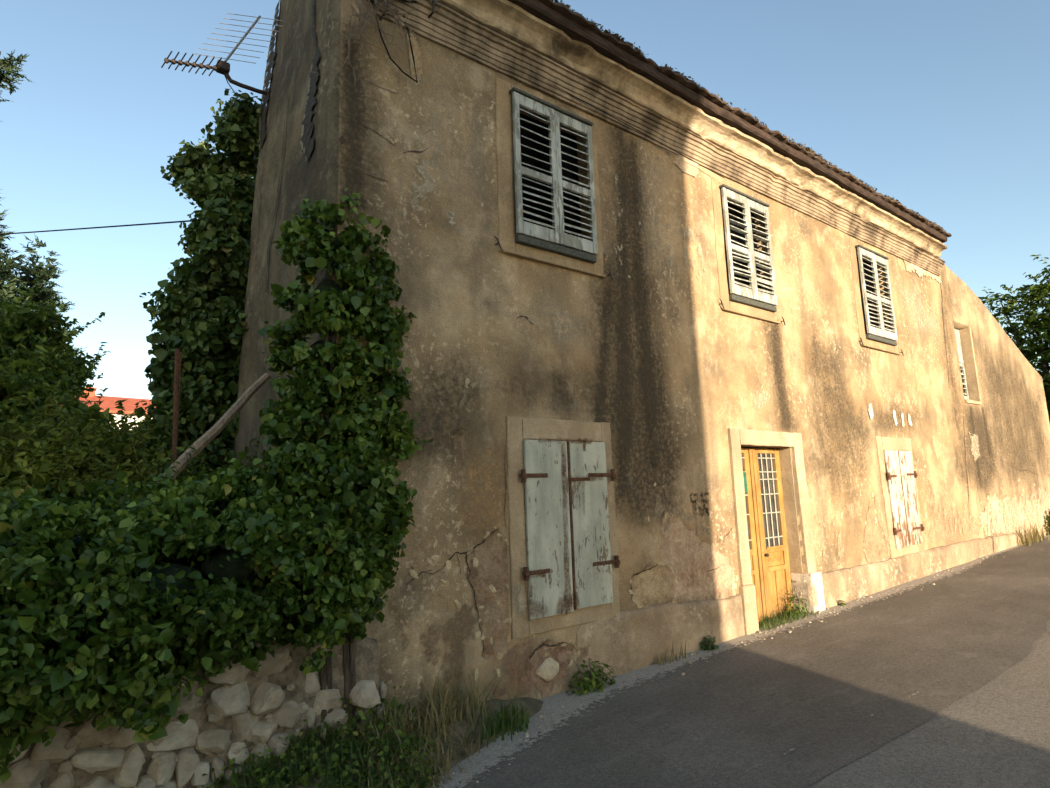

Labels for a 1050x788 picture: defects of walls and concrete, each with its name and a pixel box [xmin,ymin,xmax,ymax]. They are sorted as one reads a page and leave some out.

crack [259,0,320,292]
water stain [593,128,679,523]
crack [406,447,507,652]
spalling [628,505,738,608]
spalling [924,479,1050,537]